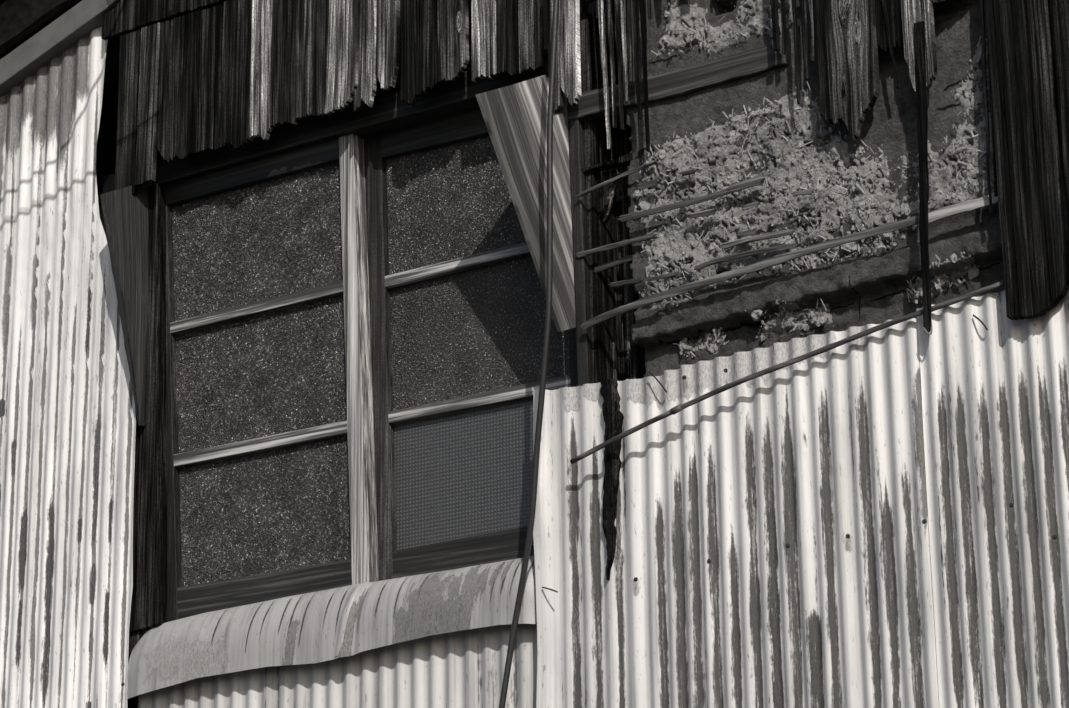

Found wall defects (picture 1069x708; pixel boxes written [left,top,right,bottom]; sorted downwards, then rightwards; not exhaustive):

flaking render [650,0,801,59]
flaking render [633,35,994,315]
peeling [562,382,601,412]
peeling [627,297,836,409]
peeling [848,325,868,350]
damp [912,369,928,529]